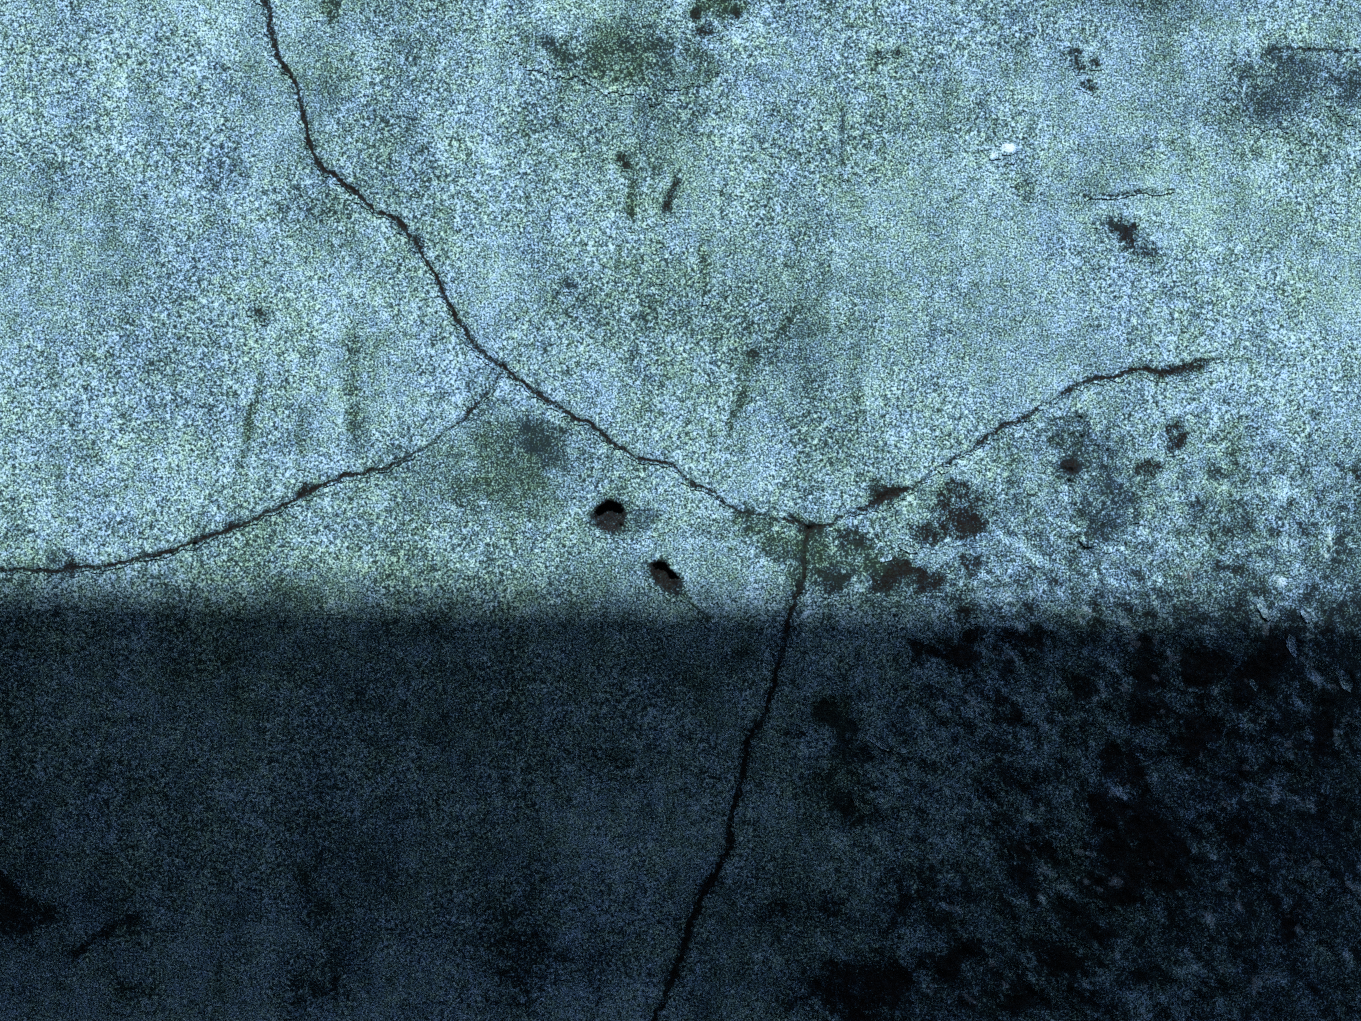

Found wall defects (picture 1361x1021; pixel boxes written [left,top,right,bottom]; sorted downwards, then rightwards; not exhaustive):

crack [0,366,508,577]
crack [254,0,1225,1021]
damp [859,465,1060,800]
damp [1128,412,1198,484]
damp [755,613,1361,1021]